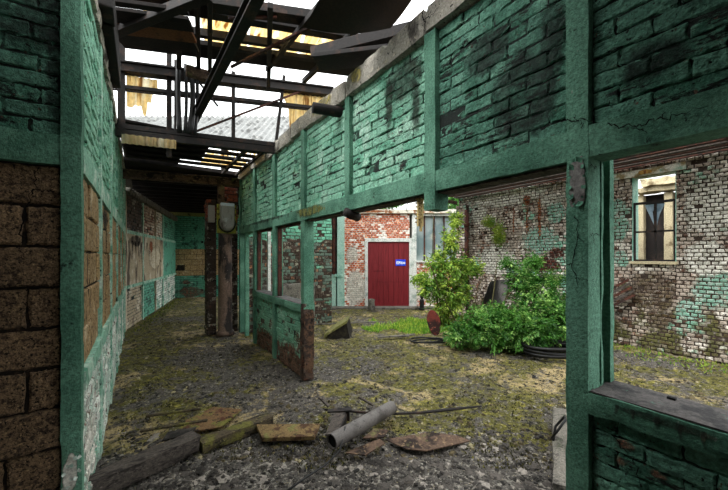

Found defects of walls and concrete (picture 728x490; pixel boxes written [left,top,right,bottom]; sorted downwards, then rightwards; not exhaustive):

water stain [385,57,422,129]
crack [566,106,707,133]
rust [523,195,542,241]
peeling [523,156,586,271]
crack [565,216,598,291]
peeling [61,453,82,490]